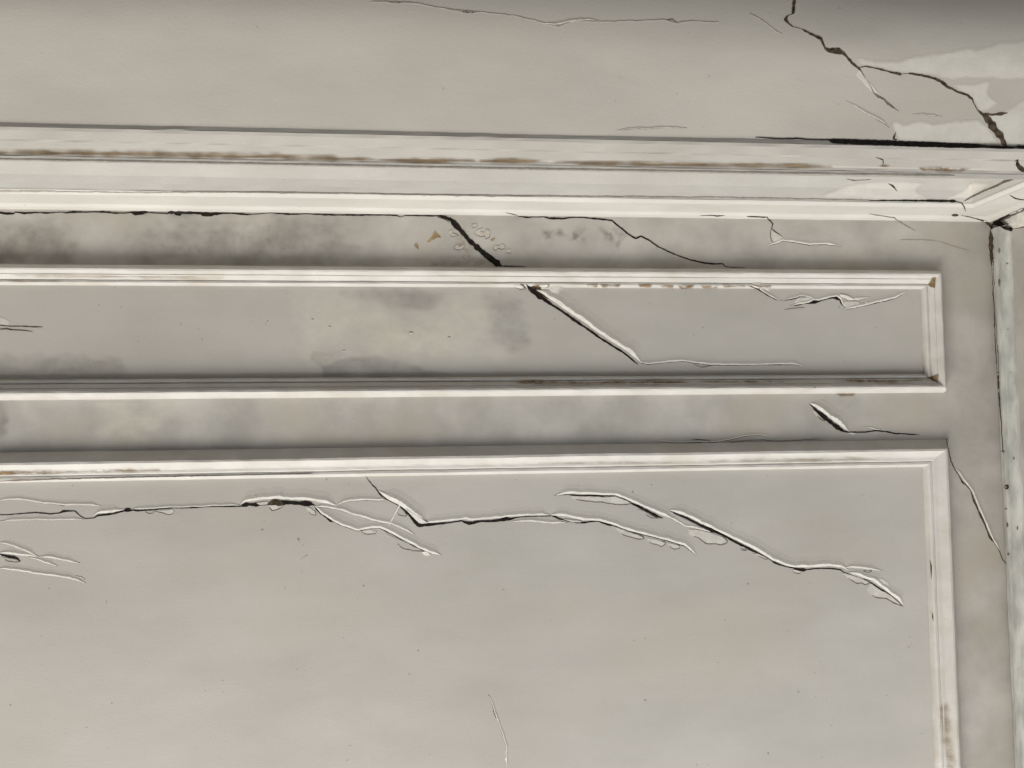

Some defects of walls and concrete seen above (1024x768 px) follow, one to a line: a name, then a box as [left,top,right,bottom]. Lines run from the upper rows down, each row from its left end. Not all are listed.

crack [372,1,719,27]
crack [750,0,1024,191]
crack [0,211,804,368]
peeling [414,229,464,258]
crack [508,213,907,310]
crack [655,399,919,443]
crack [0,473,904,606]
crack [946,439,1006,564]